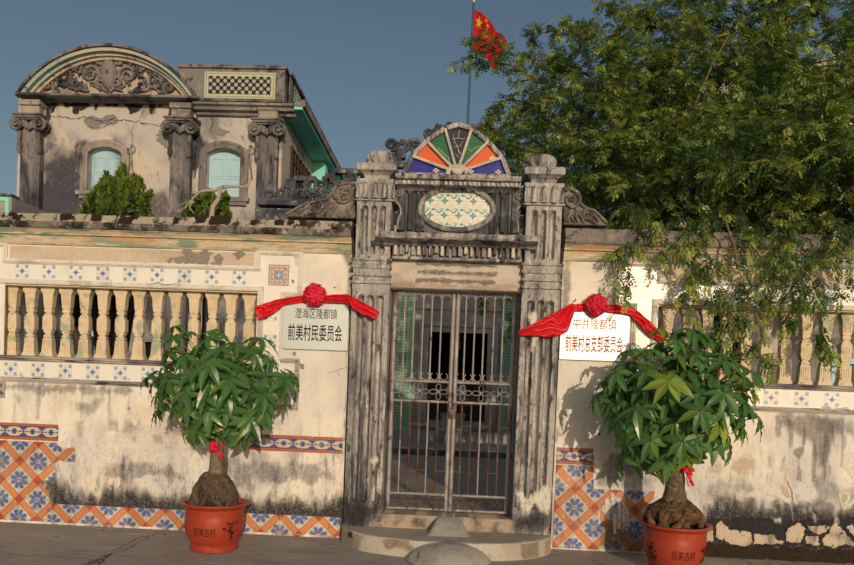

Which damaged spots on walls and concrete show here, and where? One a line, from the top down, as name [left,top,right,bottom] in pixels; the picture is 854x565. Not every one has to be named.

spalling [84,114,117,129]
crack [50,115,160,147]
damp [43,141,89,214]
spalling [167,249,246,265]
damp [42,479,188,510]
damp [245,487,384,526]
damp [515,510,549,534]
damp [706,483,854,525]
spalling [706,513,854,549]
damp [771,542,854,562]